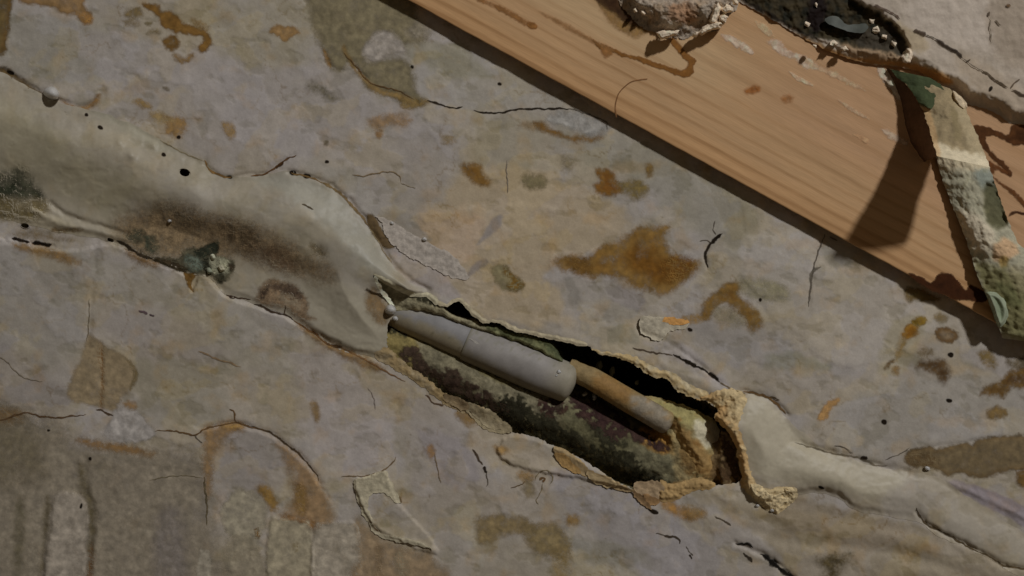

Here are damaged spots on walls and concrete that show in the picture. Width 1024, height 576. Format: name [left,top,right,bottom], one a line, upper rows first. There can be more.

rust [125,4,211,63]
crack [341,50,609,125]
damp [0,169,47,219]
damp [118,207,331,283]
flaking render [375,216,469,280]
rust [556,226,698,294]
crack [701,222,723,267]
rust [683,279,787,330]
flaking render [373,274,798,515]
crack [157,409,396,480]
damp [905,435,1024,478]
flaking render [266,471,433,576]